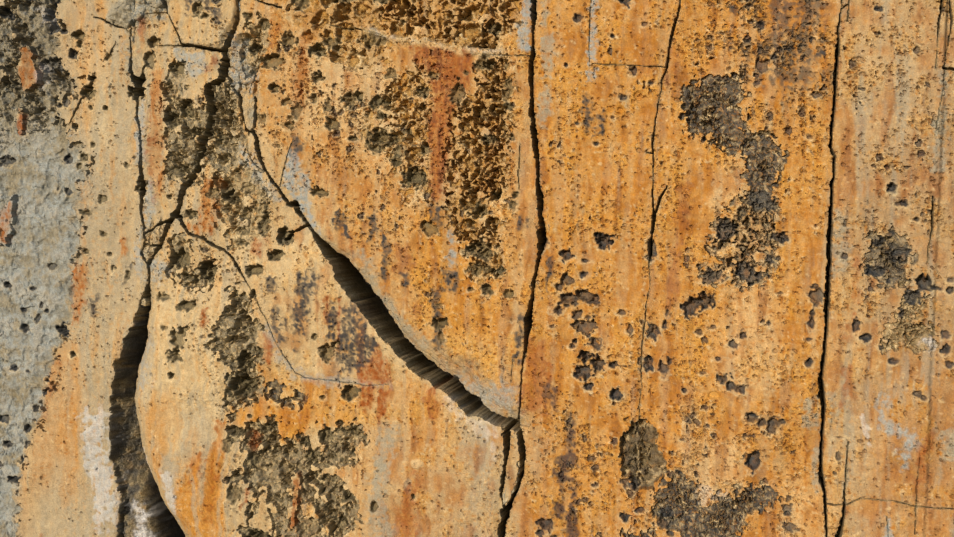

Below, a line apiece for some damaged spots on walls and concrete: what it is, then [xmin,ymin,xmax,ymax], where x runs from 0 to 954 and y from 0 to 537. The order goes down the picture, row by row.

spalling [0,0,109,537]
leakage [73,403,187,537]
corrosion [186,416,229,532]
spalling [142,34,379,537]
crack [94,0,548,537]
spalling [240,0,522,300]
corrosion [408,44,475,204]
corrosion [512,336,564,423]
crack [588,0,682,420]
corrosion [661,174,698,331]
spalling [615,73,791,381]
crack [817,0,954,537]